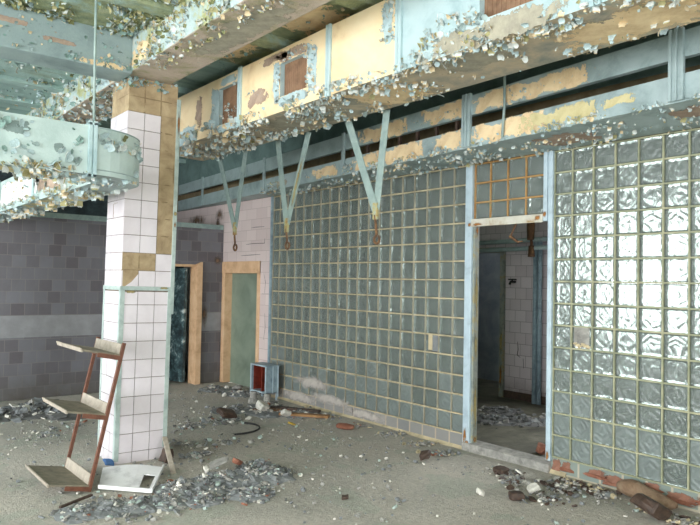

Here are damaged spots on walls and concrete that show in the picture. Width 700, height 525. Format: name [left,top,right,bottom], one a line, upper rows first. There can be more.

peeling [0,0,700,286]
leakage [285,377,378,421]
spalling [551,459,574,474]
spalling [583,469,623,487]
spalling [644,482,700,508]